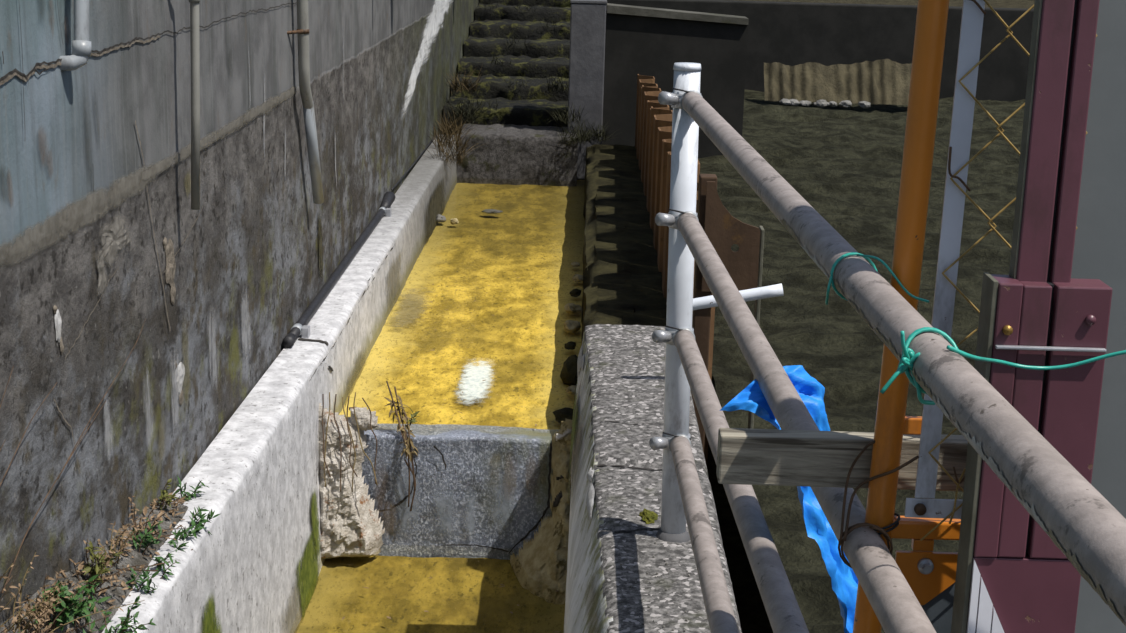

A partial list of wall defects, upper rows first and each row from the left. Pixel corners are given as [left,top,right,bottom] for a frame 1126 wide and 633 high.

crack [0,0,297,123]
leakage [242,294,250,352]
leakage [104,399,112,455]
spalling [319,403,385,559]
leakage [297,490,320,617]